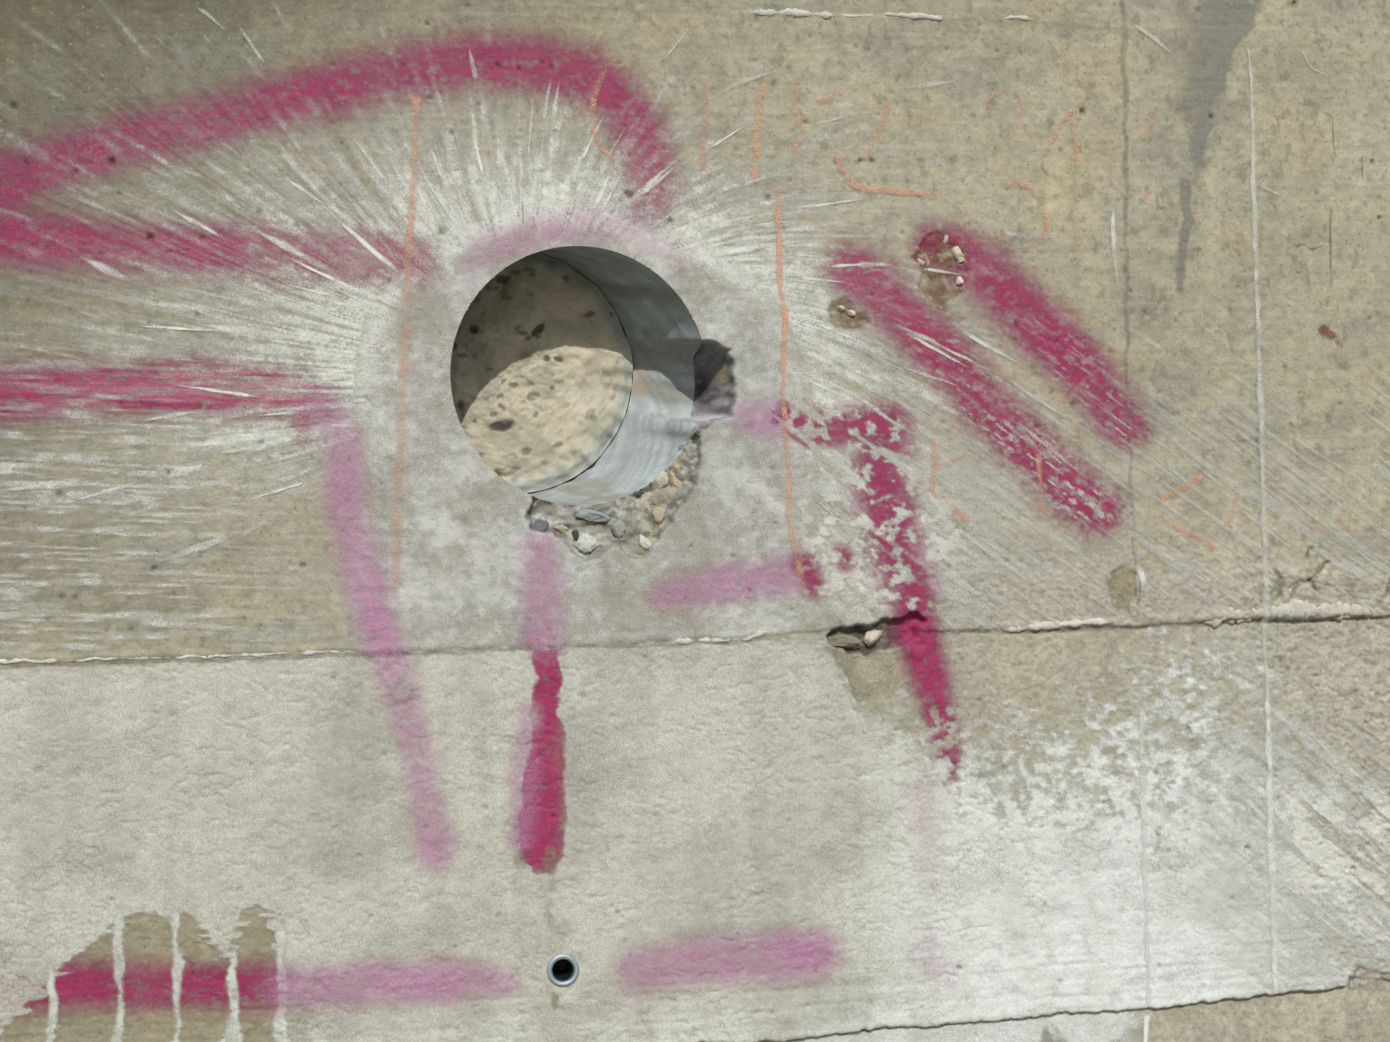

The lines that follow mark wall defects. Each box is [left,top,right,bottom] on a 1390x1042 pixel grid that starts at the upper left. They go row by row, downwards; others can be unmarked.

damp [635,171,670,198]
damp [1248,51,1258,283]
spalling [914,233,965,310]
damp [186,381,250,397]
damp [0,453,109,474]
damp [2,457,262,523]
spalling [528,345,735,560]
damp [984,424,1109,519]
damp [0,527,101,652]
spalling [1110,568,1146,613]
damp [63,609,225,650]
peeling [827,614,913,701]